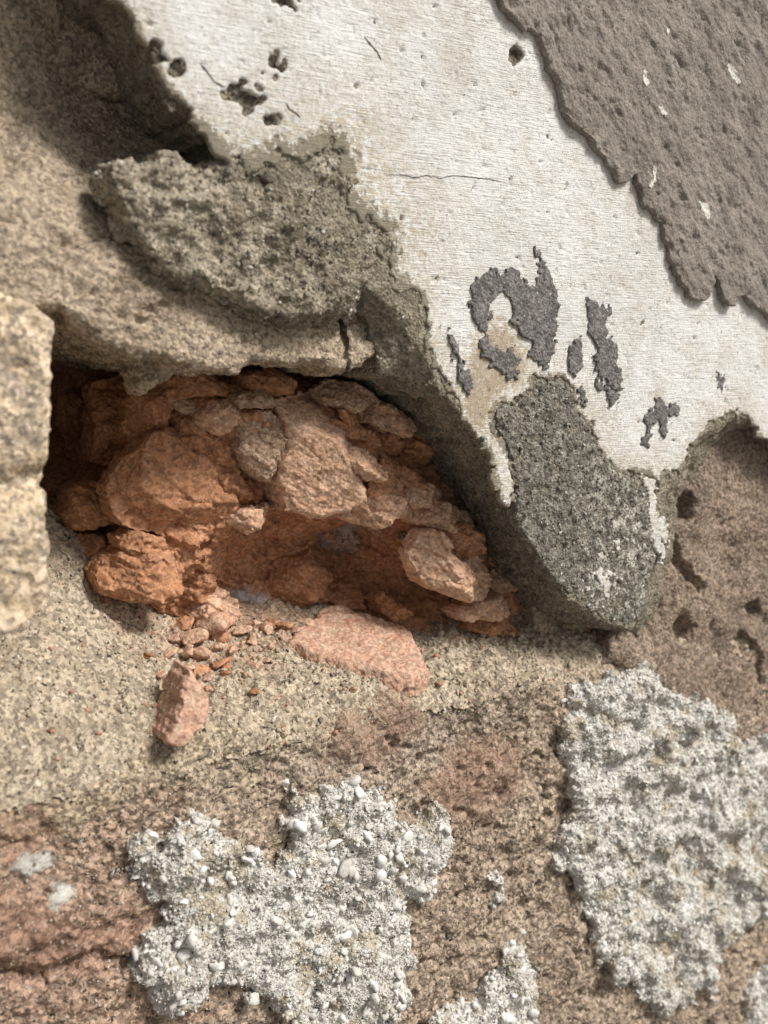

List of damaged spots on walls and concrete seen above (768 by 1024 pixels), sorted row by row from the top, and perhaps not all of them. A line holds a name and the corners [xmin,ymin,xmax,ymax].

spalling [39,360,521,637]